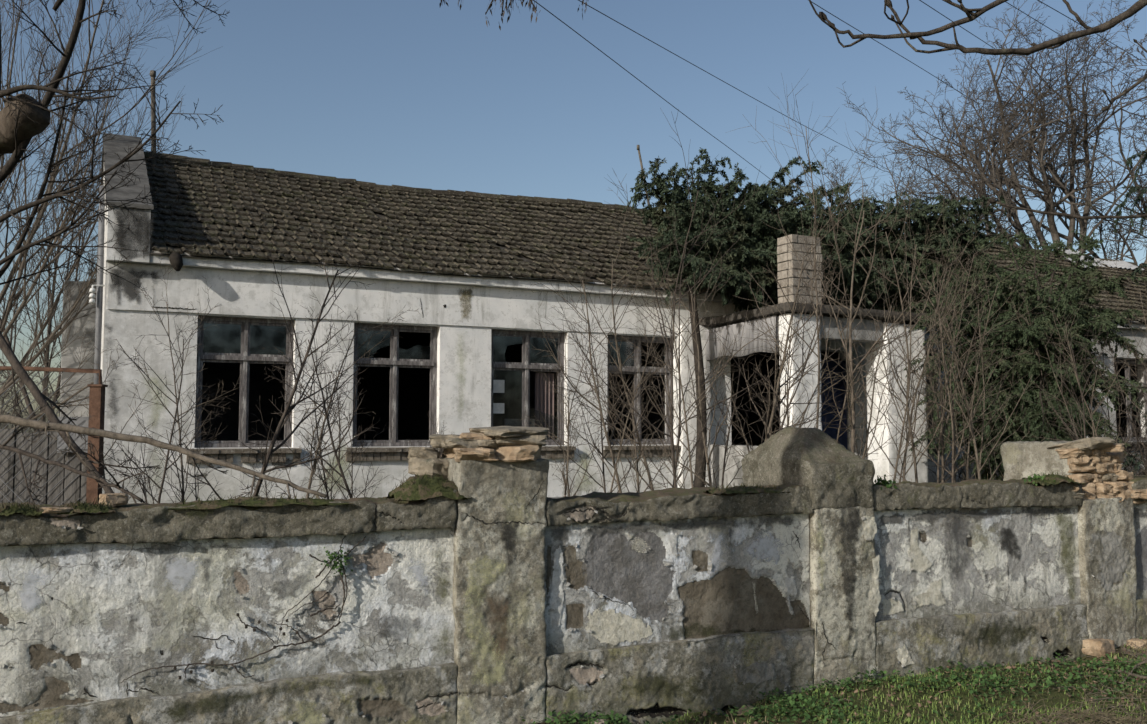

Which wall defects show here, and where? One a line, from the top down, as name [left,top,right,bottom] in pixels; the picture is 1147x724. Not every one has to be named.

water stain [460,289,472,317]
spalling [349,542,398,579]
peeling [1125,528,1147,592]
spalling [312,590,338,619]
peeling [546,531,811,639]
peeling [0,643,94,714]
crack [126,683,157,724]
spalling [358,697,449,722]